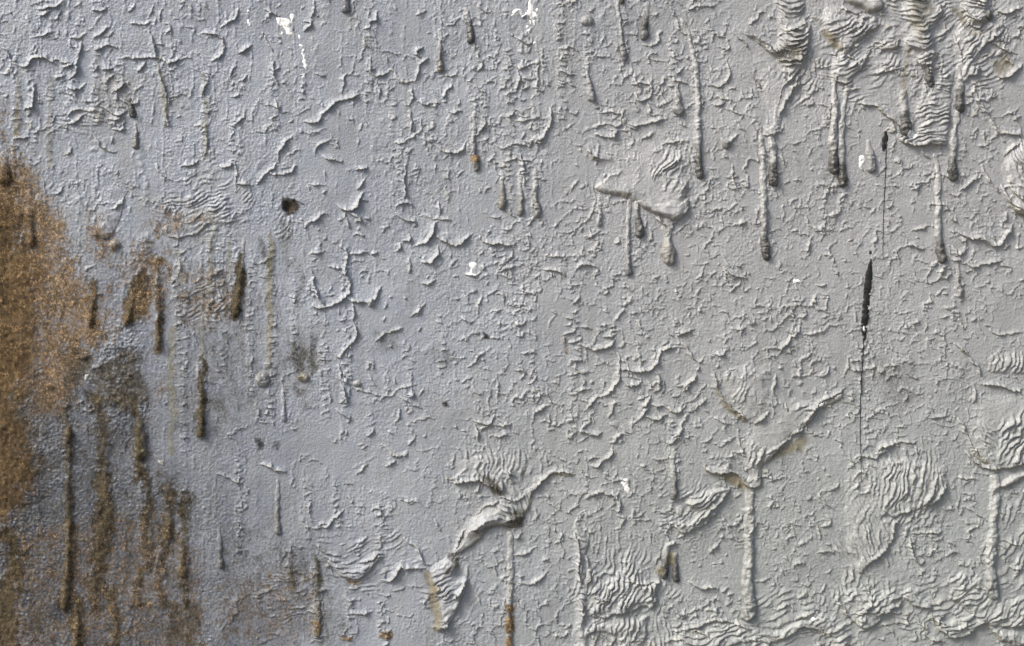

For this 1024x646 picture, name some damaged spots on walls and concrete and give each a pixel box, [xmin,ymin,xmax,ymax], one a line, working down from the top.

crack [991,2,1024,18]
crack [850,54,906,141]
crack [969,35,1024,157]
crack [0,0,871,575]
corrosion [0,103,351,646]
crack [753,146,1024,594]
crack [256,562,284,640]
crack [301,536,432,641]
crack [513,528,563,585]
crack [659,513,741,643]